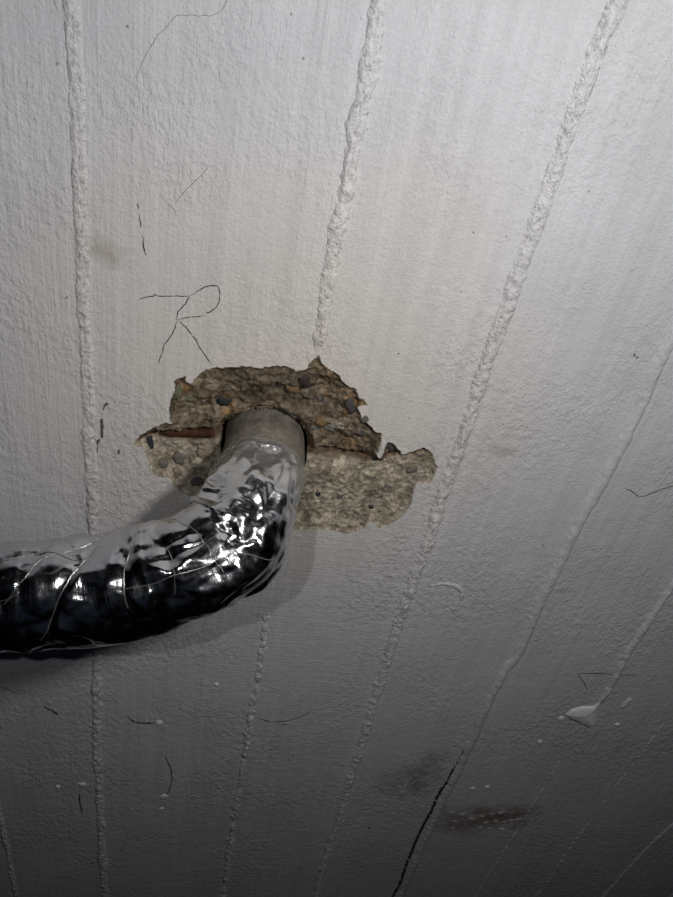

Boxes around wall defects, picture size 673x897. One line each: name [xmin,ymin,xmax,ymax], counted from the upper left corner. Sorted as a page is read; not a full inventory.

crack [139,285,220,363]
spalling [134,355,438,534]
crack [392,754,462,897]